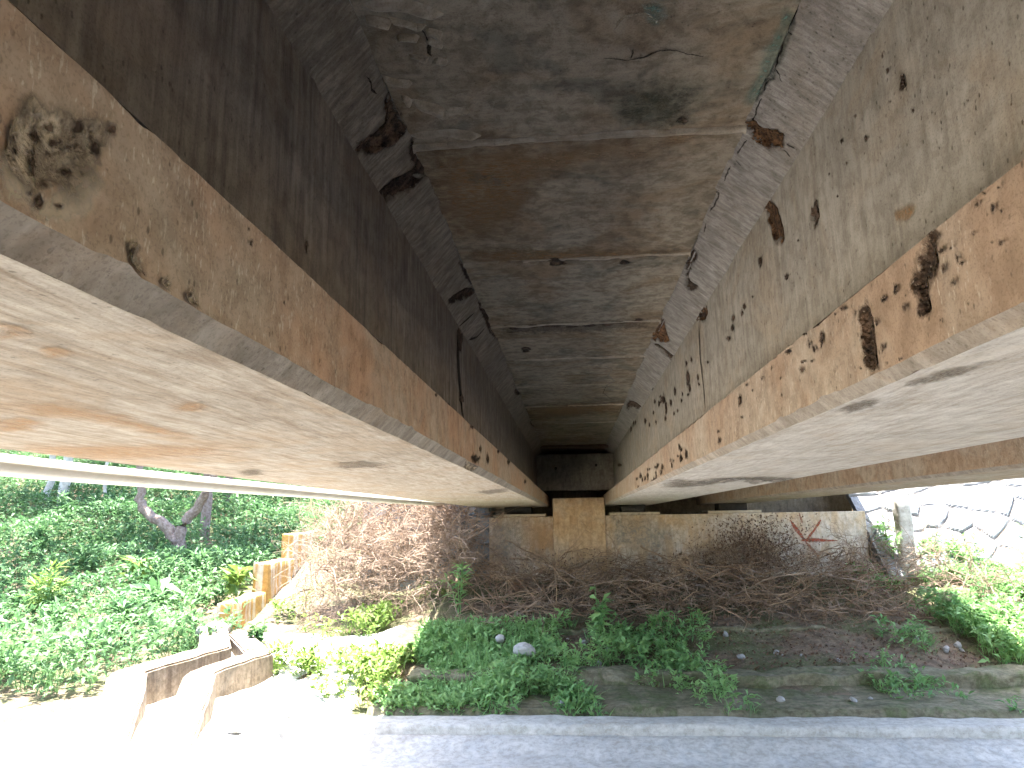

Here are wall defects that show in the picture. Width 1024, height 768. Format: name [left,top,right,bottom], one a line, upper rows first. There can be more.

crack [604,49,703,61]
spalling [29,121,100,209]
spalling [355,92,424,199]
crack [704,5,799,232]
spalling [745,120,795,157]
spalling [765,200,799,243]
spalling [811,200,820,228]
spalling [449,262,642,335]
spalling [652,319,673,360]